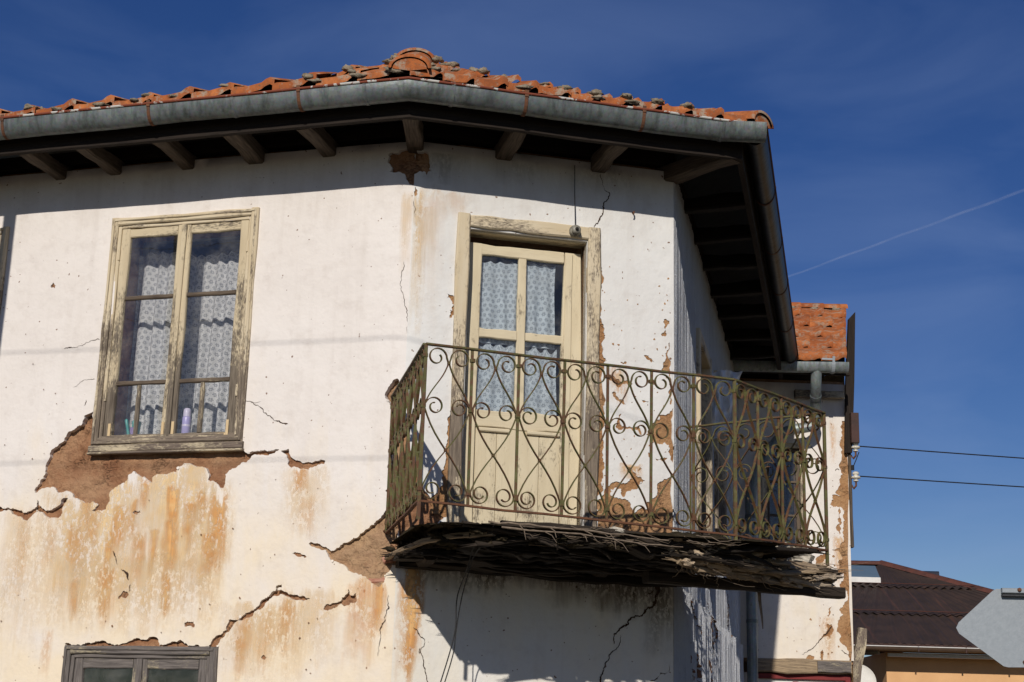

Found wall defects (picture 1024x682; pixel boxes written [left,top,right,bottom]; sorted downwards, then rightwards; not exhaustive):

flaking render [389,151,430,196]
crack [594,176,610,226]
flaking render [597,266,673,533]
damp [53,465,225,608]
flaking render [0,416,325,520]
flaking render [294,416,450,624]
flaking render [796,421,852,661]
flaking render [67,585,308,647]
crack [599,587,660,682]